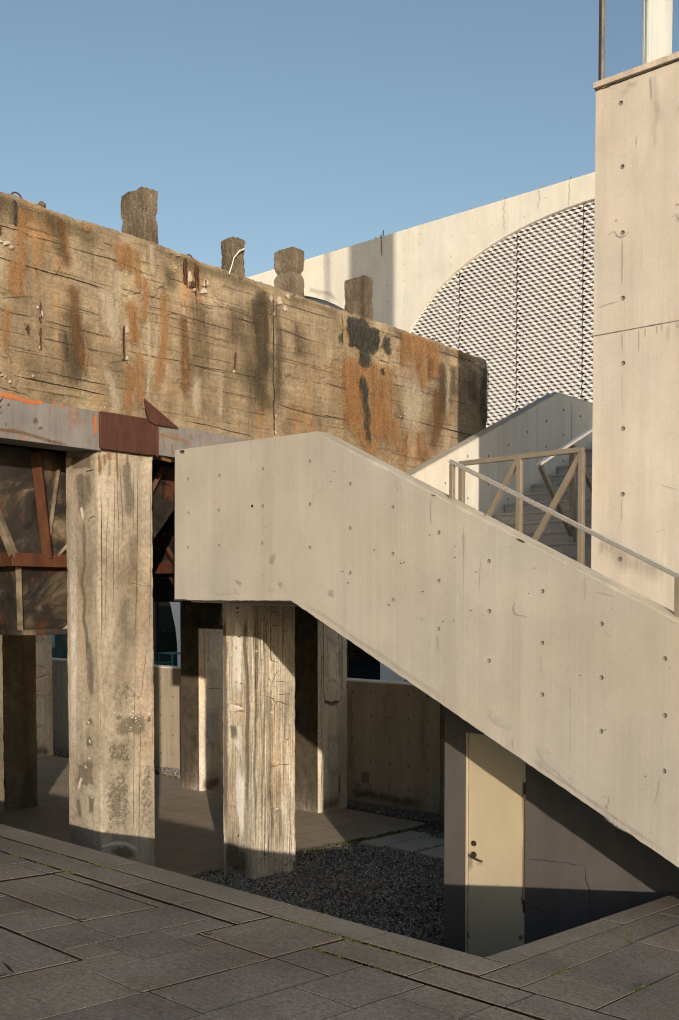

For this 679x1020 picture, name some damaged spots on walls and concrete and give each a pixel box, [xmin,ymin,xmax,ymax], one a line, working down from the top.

corrosion [0,419,61,444]
corrosion [0,392,75,414]
corrosion [70,286,88,369]
corrosion [117,243,149,341]
corrosion [156,292,168,388]
damp [255,292,280,405]
corrosion [344,356,390,455]
corrosion [402,332,441,458]